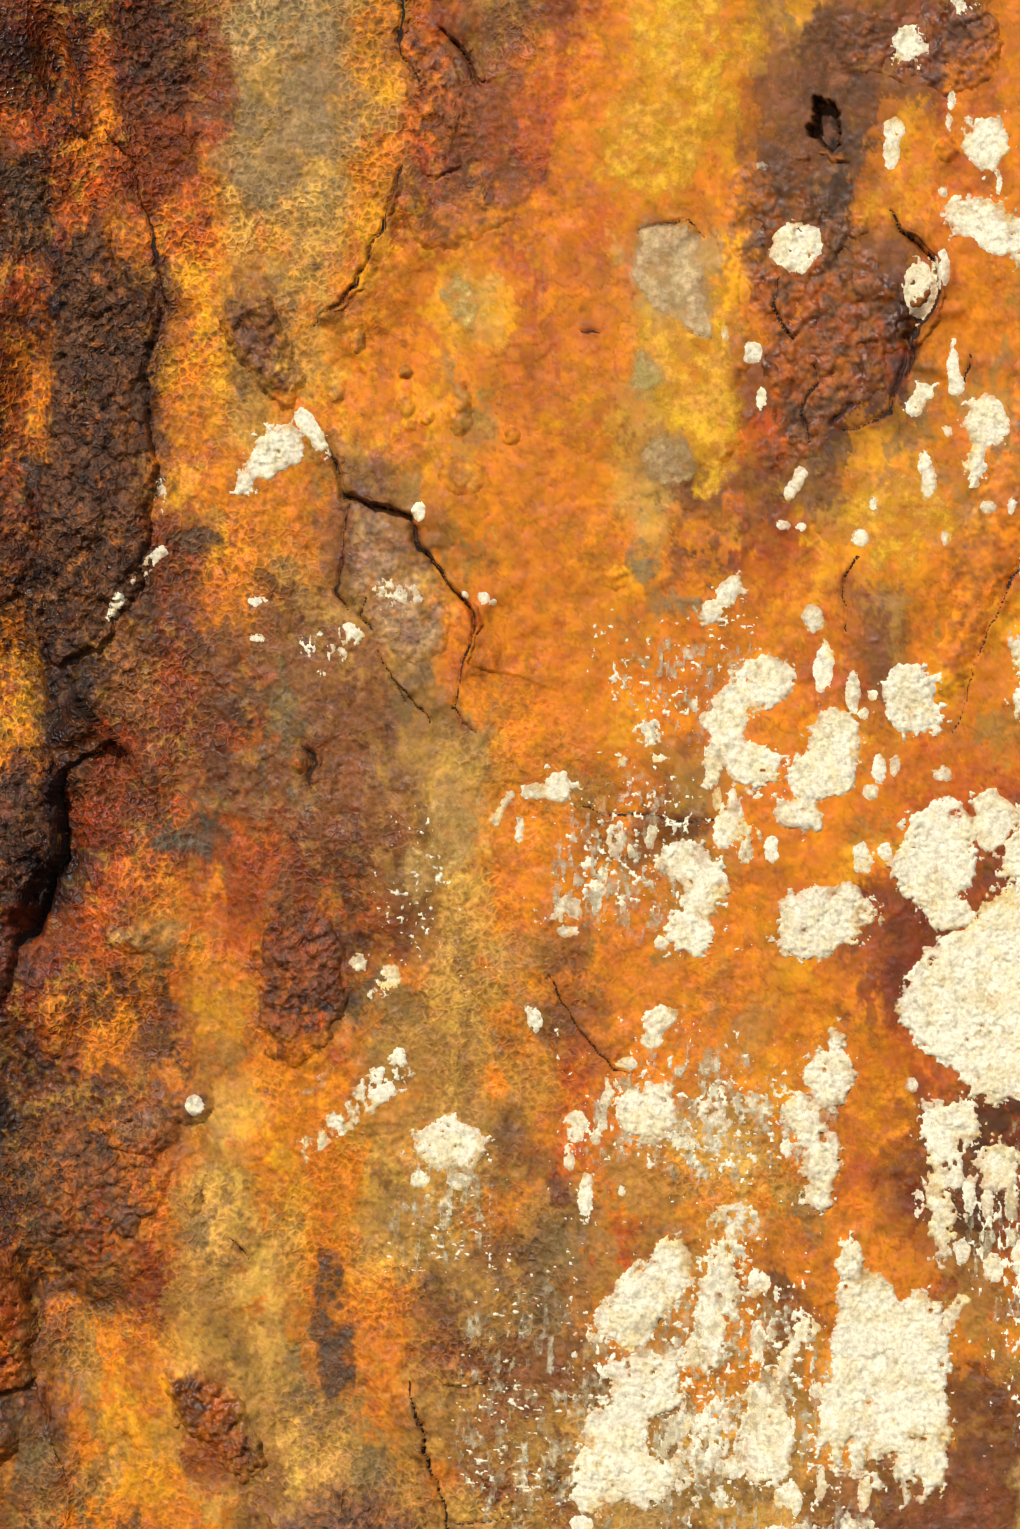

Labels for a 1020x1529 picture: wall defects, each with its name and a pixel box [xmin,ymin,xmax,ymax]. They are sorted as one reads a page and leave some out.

corrosion [595,0,761,202]
crack [32,79,172,422]
corrosion [30,217,222,668]
crack [313,165,403,327]
crack [771,209,947,443]
crack [329,449,484,733]
crack [841,555,860,632]
crack [952,560,1020,733]
corrosion [0,719,141,1003]
corrosion [856,898,948,1157]
corrosion [270,1039,361,1402]
corrosion [160,1363,268,1485]